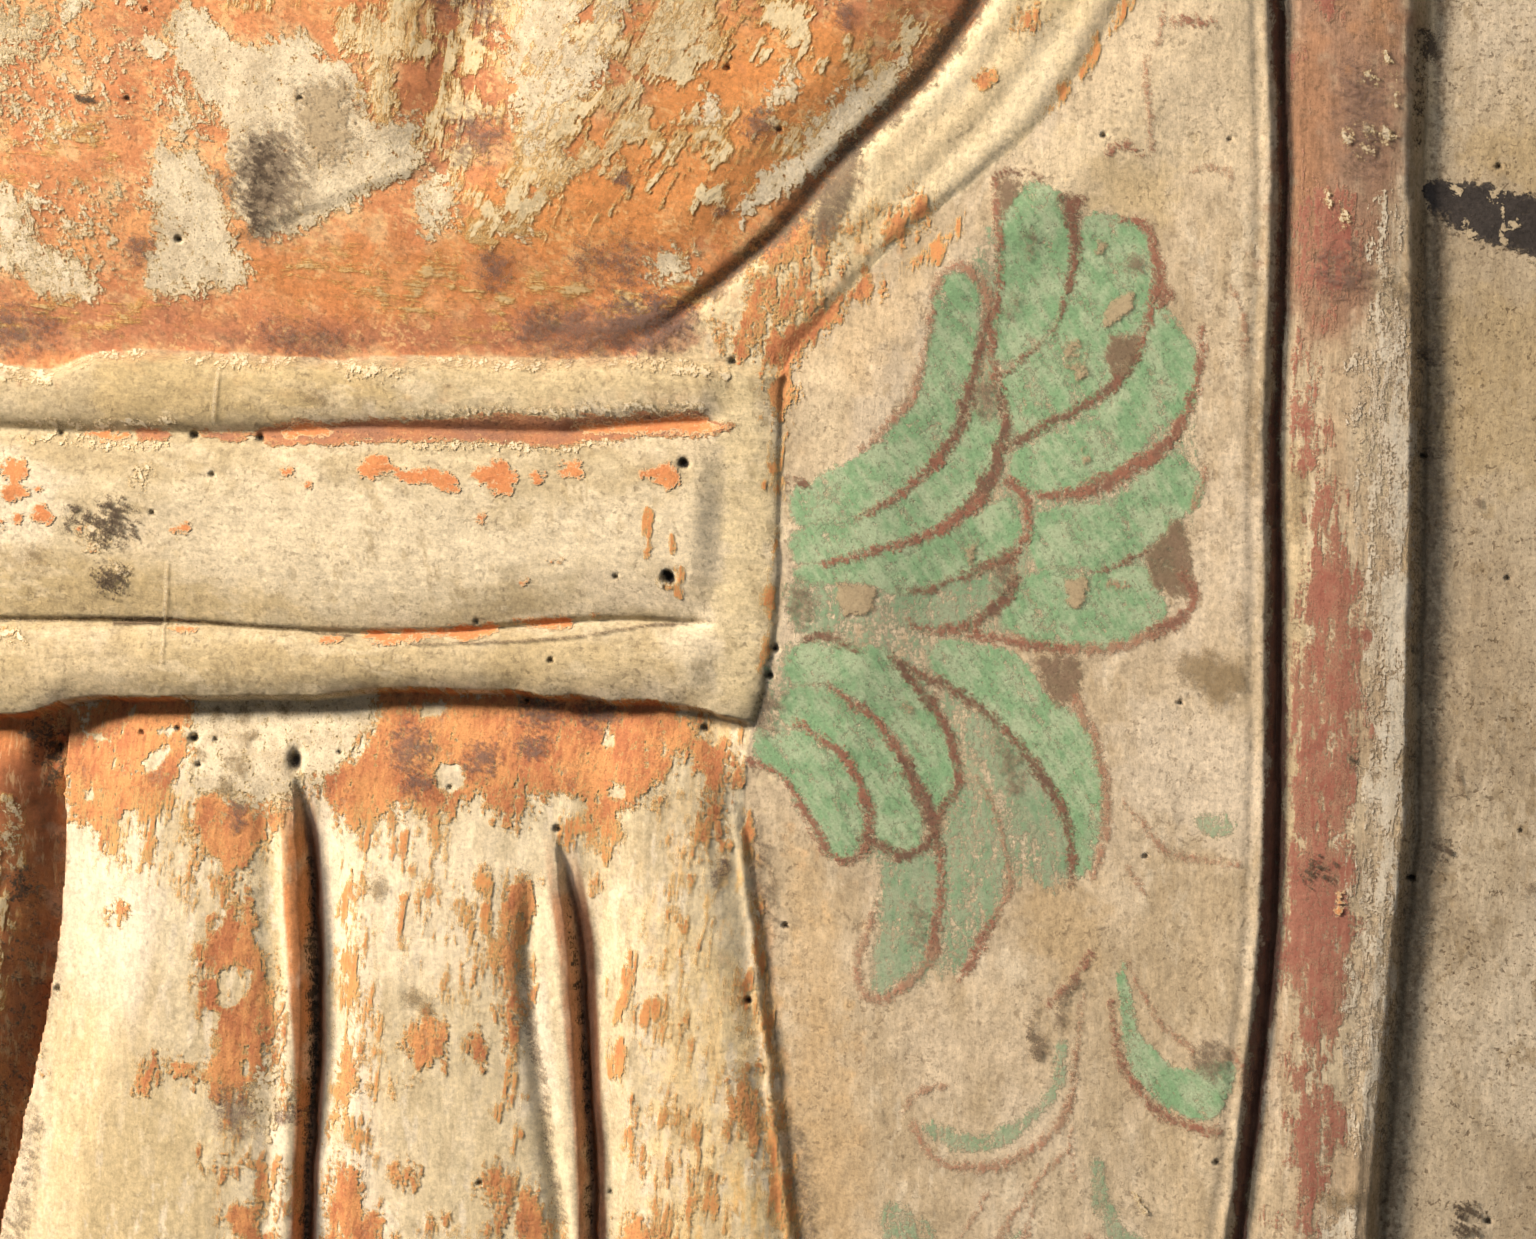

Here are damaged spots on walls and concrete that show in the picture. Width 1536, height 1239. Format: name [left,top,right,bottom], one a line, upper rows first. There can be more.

peeling [971,67,999,92]
peeling [1009,0,1056,41]
peeling [1040,0,1135,122]
peeling [1341,121,1400,160]
peeling [1362,49,1401,108]
peeling [0,0,965,499]
peeling [1320,189,1350,231]
peeling [756,528,780,674]
peeling [0,793,26,1011]
peeling [36,686,802,1239]